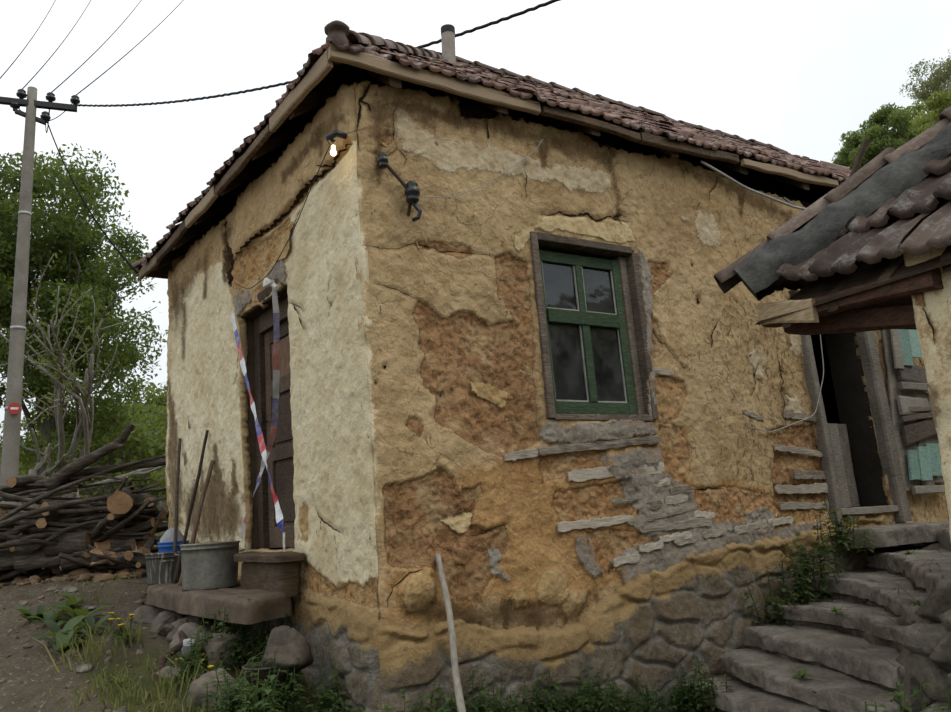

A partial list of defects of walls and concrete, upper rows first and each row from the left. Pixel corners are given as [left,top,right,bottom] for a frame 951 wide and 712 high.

water stain [281,114,343,183]
crack [233,83,407,262]
peeling [394,104,611,194]
water stain [220,222,232,282]
crack [365,243,491,256]
water stain [171,265,207,357]
spalling [413,215,635,457]
water stain [184,444,245,541]
spalling [383,465,513,603]
spalling [539,450,613,485]
spalling [552,482,653,575]
spalling [695,391,825,531]